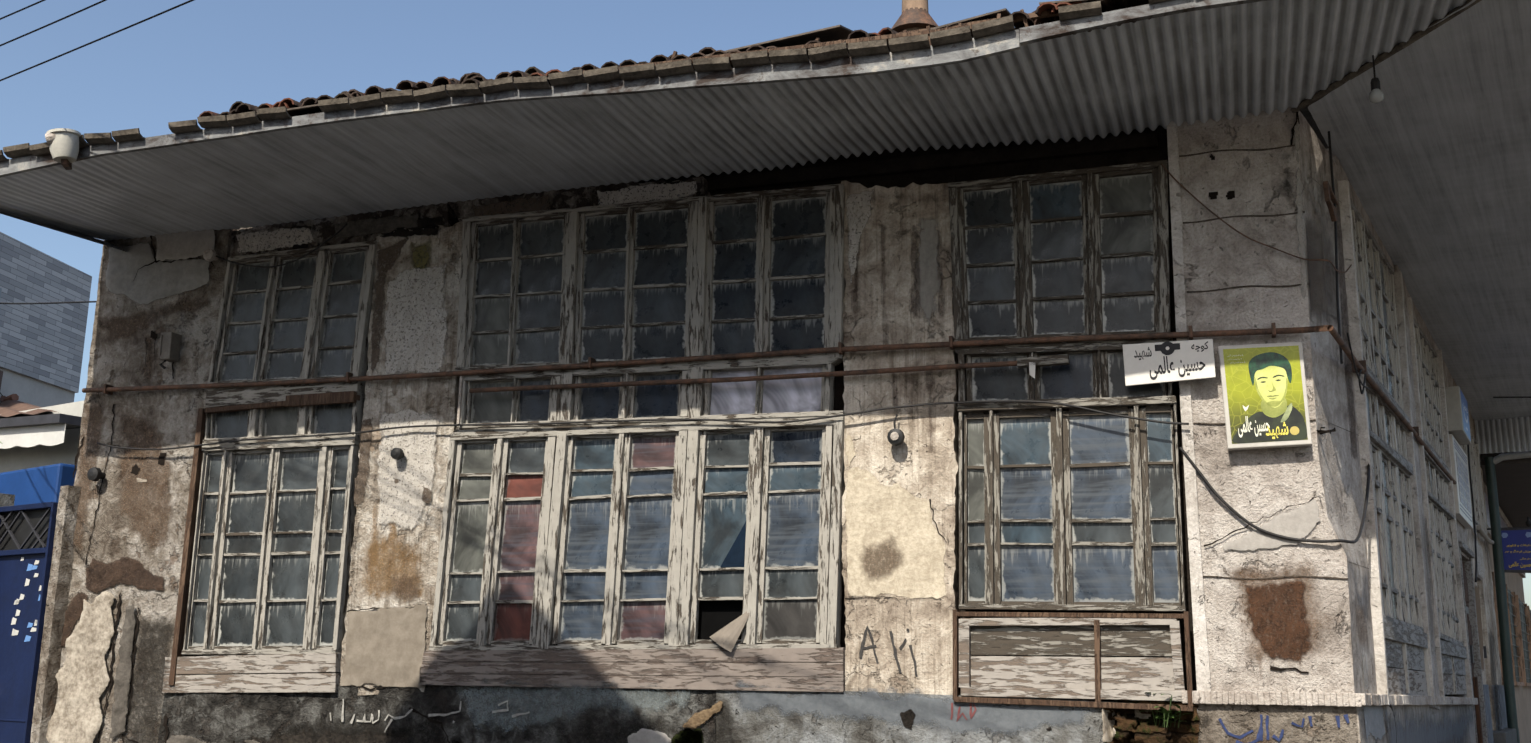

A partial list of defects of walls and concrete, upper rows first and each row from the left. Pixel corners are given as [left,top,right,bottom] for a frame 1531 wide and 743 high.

peeling [597,181,697,205]
damp [365,474,421,599]
peeling [46,557,164,743]
flaking render [166,735,207,743]
flaking render [628,701,723,743]
flaking render [1101,700,1200,743]